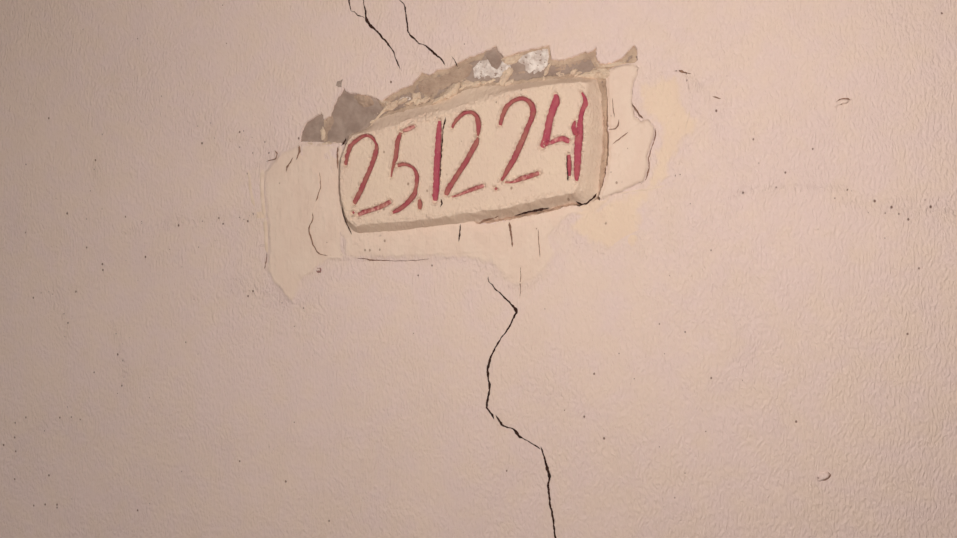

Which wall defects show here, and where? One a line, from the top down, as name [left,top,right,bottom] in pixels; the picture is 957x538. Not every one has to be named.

crack [348,0,458,68]
spalling [286,45,637,200]
crack [486,267,556,538]